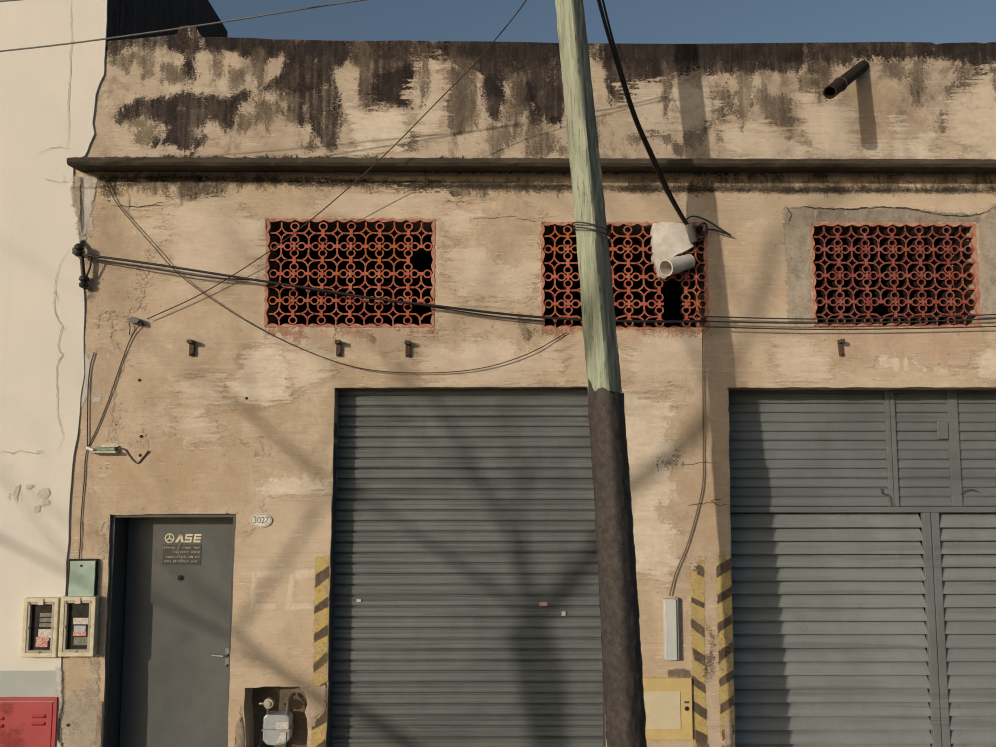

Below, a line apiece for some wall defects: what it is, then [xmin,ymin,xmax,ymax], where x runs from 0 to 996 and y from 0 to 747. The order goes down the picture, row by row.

crack [41,6,72,152]
damp [105,26,565,158]
damp [588,42,996,159]
crack [44,177,82,230]
damp [603,173,996,197]
crack [3,253,67,454]
damp [73,173,578,569]
flaking render [301,685,327,727]